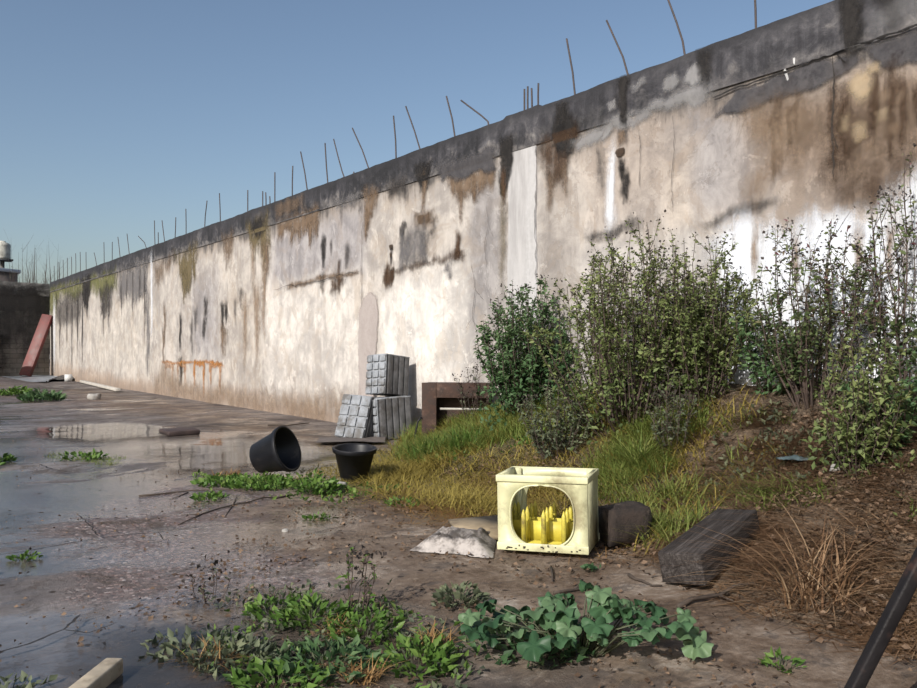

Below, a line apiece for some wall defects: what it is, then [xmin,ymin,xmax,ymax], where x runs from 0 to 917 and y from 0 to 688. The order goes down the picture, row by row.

crack [713,24,917,179]
water stain [716,0,917,174]
water stain [415,135,513,218]
water stain [540,101,578,206]
water stain [588,152,635,241]
water stain [0,246,196,368]
water stain [179,299,208,347]
water stain [240,207,355,347]
water stain [383,232,463,288]
rust [163,360,221,389]
crack [0,515,213,555]
crack [0,615,117,652]